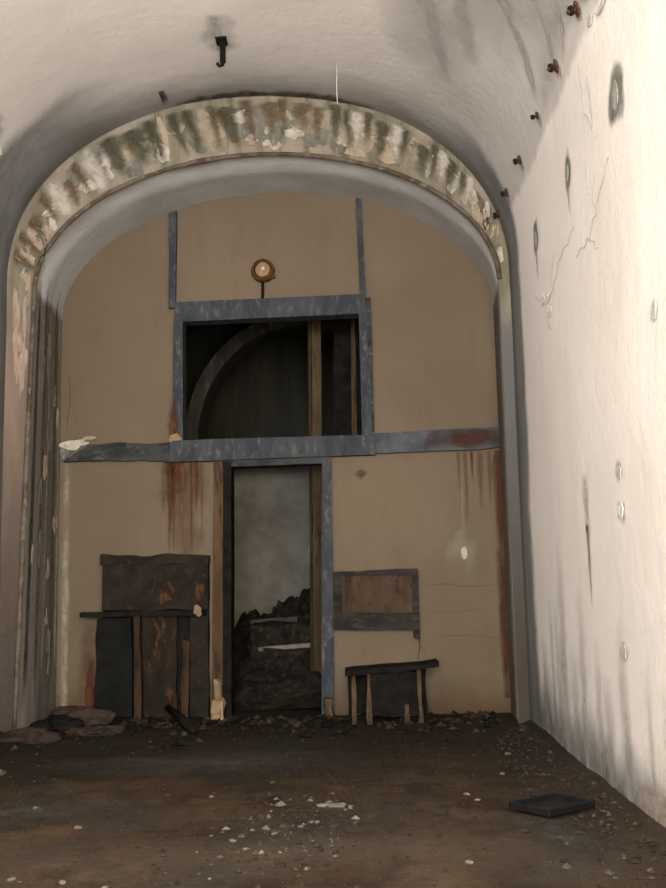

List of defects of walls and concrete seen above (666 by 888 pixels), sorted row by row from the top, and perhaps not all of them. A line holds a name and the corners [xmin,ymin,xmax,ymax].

damp [499,0,570,87]
peeling [12,103,504,395]
crack [535,63,609,329]
rust [162,462,203,539]
rust [449,430,509,698]
damp [537,691,666,828]